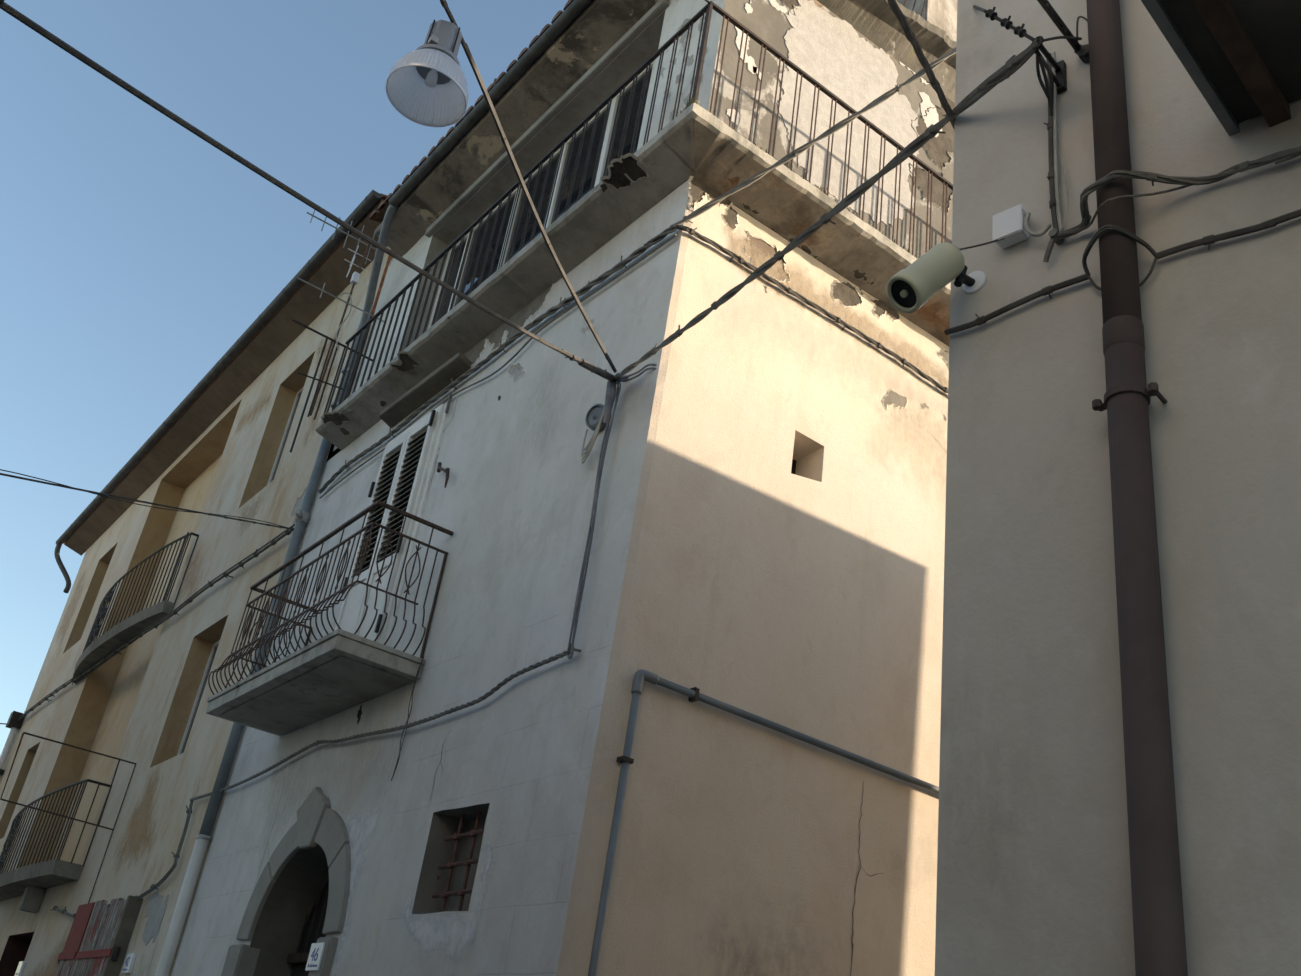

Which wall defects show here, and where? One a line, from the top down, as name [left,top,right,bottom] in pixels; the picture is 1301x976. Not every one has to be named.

flaking render [768,0,801,16]
flaking render [735,26,762,81]
flaking render [726,108,759,125]
spalling [600,153,655,192]
flaking render [830,268,901,323]
flaking render [937,348,949,370]
flaking render [881,389,947,422]
crack [850,782,880,976]